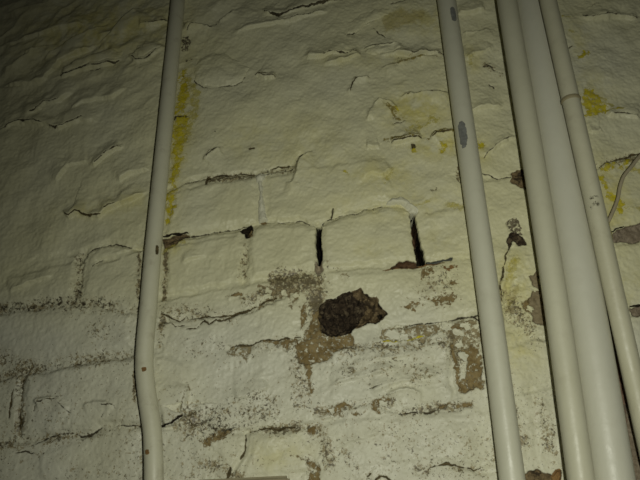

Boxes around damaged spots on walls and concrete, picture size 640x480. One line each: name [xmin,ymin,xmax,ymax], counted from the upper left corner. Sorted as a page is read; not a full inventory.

damp [582,88,622,116]
damp [165,70,201,224]
spalling [499,218,527,300]
crack [162,298,277,329]
peeling [227,345,252,363]
spalling [252,284,388,394]
spalling [380,319,485,393]
spalling [522,270,546,325]